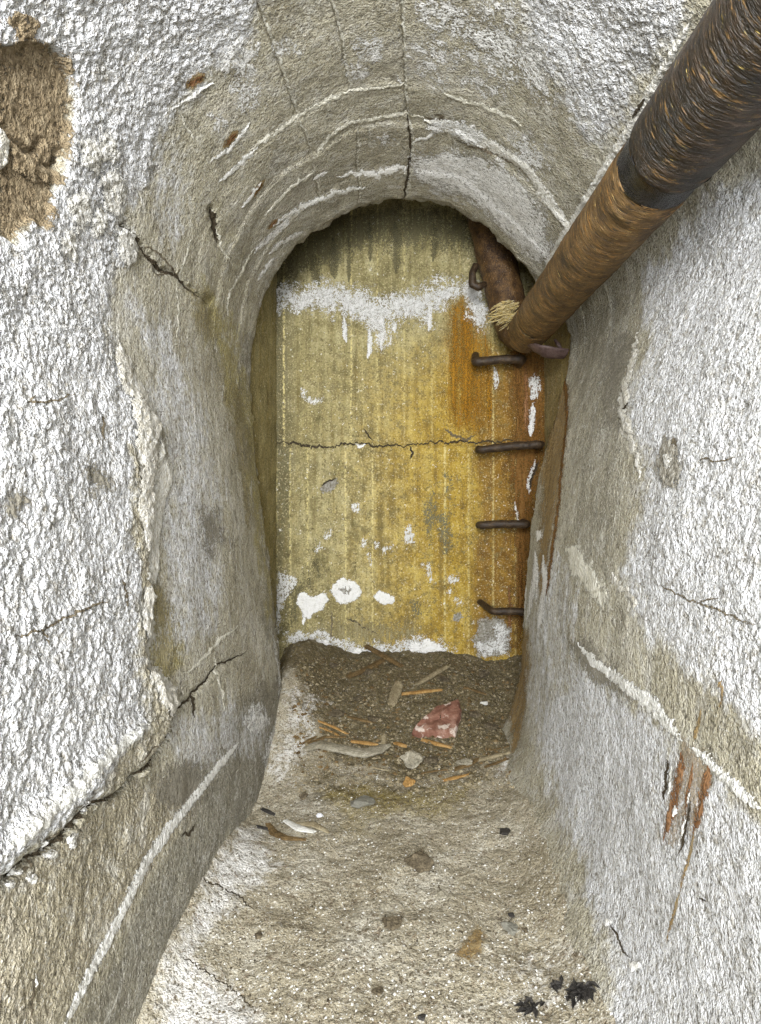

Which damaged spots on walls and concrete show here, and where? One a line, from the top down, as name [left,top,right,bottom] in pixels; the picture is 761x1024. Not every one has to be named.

spalling [0,11,139,269]
crack [120,226,206,304]
crack [399,0,415,198]
water stain [254,22,690,358]
crack [277,428,528,459]
rust [440,297,571,753]
crack [2,651,246,888]
rust [663,709,712,940]